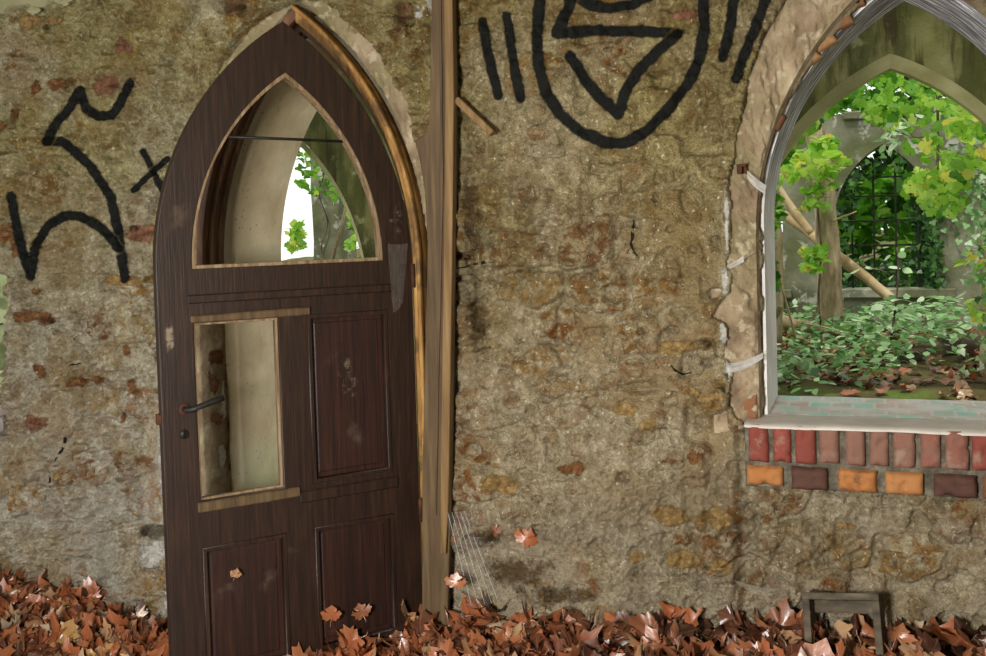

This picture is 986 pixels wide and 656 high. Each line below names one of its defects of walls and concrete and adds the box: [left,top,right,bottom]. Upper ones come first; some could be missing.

flaking render [0,0,74,16]